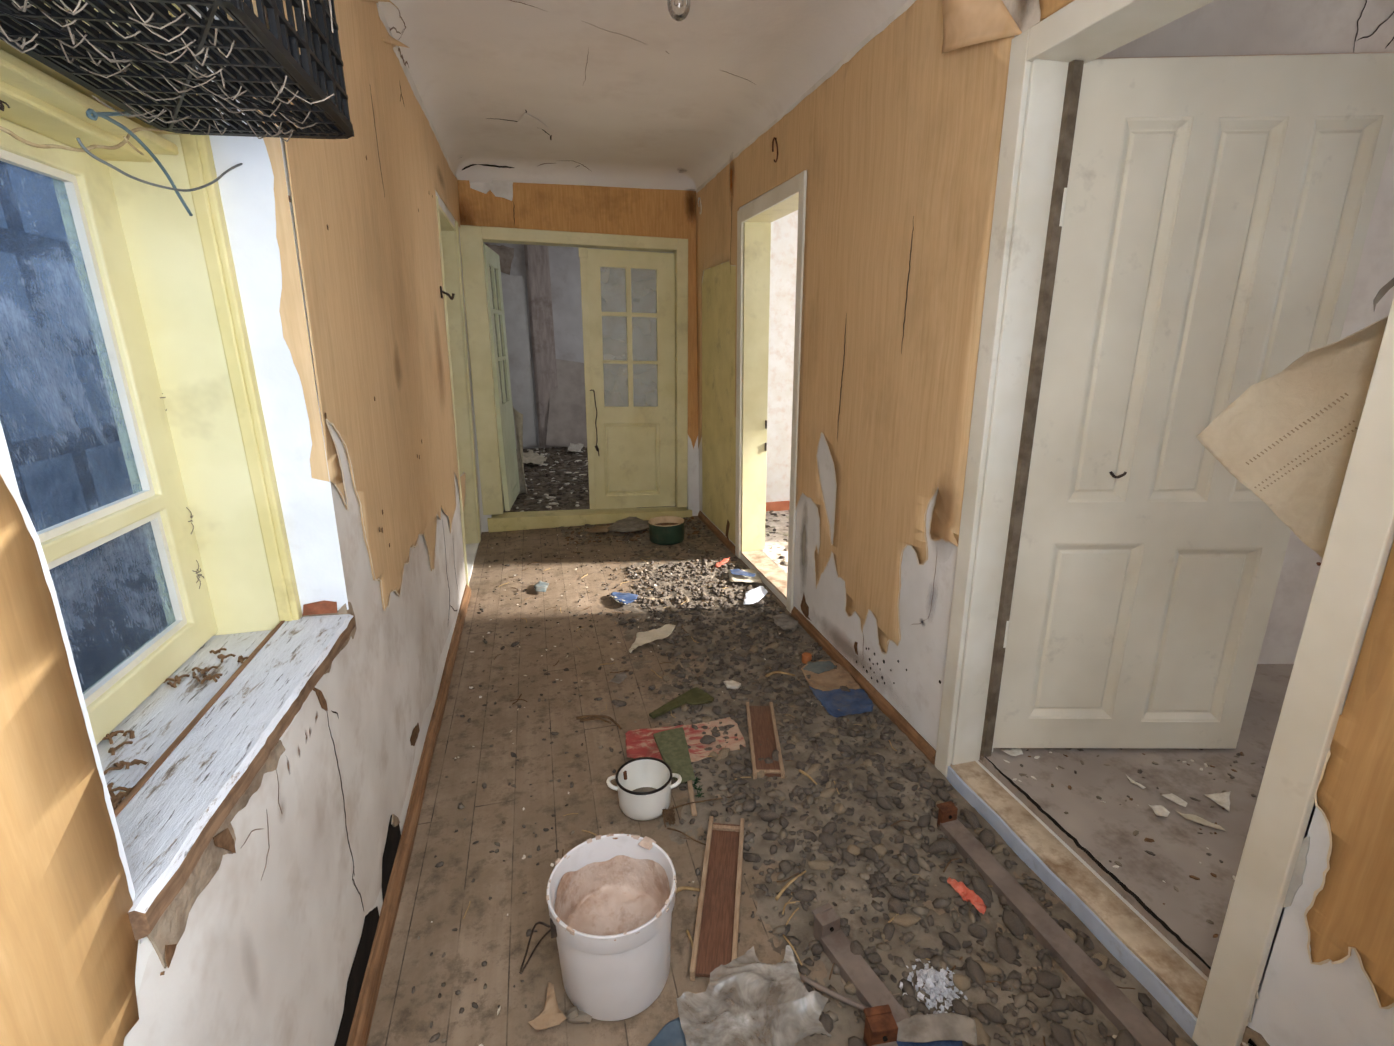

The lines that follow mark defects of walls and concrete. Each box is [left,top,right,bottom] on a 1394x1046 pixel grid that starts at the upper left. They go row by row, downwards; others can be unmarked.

peeling [942,0,1041,53]
crack [1354,0,1394,48]
peeling [0,420,135,901]
peeling [124,47,466,1046]
peeling [794,432,958,750]
crack [327,711,364,910]
peeling [1240,747,1394,1046]